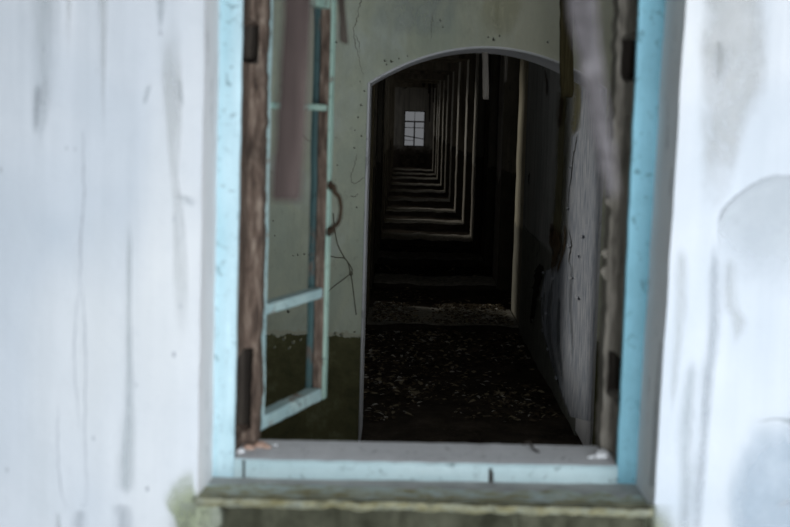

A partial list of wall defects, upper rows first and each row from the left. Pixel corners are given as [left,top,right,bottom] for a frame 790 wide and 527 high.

water stain [217,497,652,527]